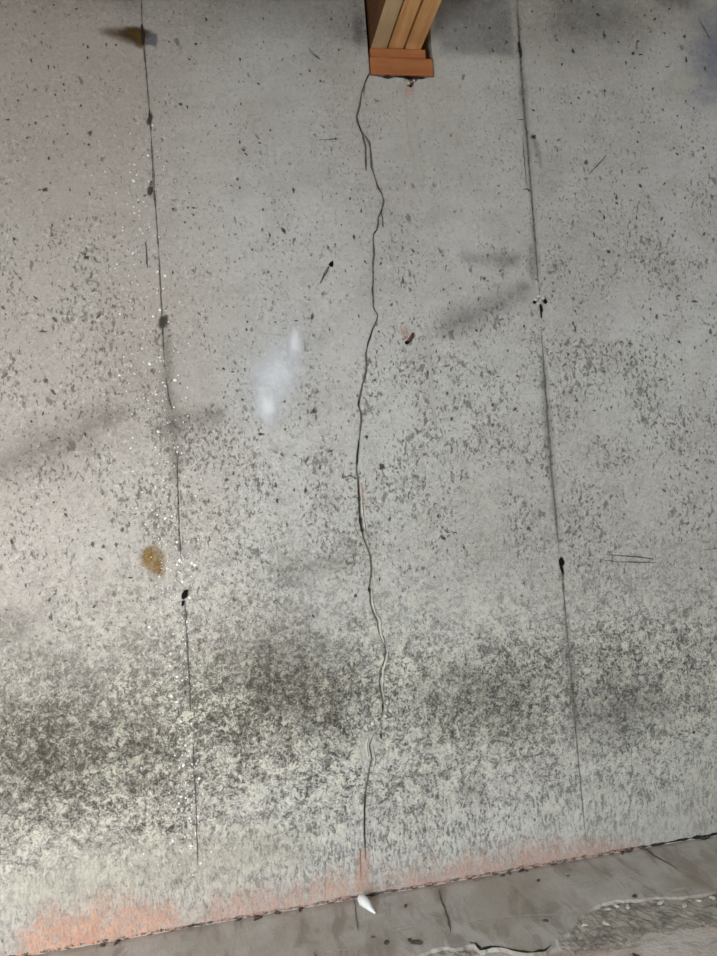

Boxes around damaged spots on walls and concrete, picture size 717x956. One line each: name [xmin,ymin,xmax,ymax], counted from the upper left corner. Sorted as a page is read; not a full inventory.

crack [342,74,392,872]
rust [143,548,163,573]
rust [19,902,178,956]
spalling [560,894,717,955]